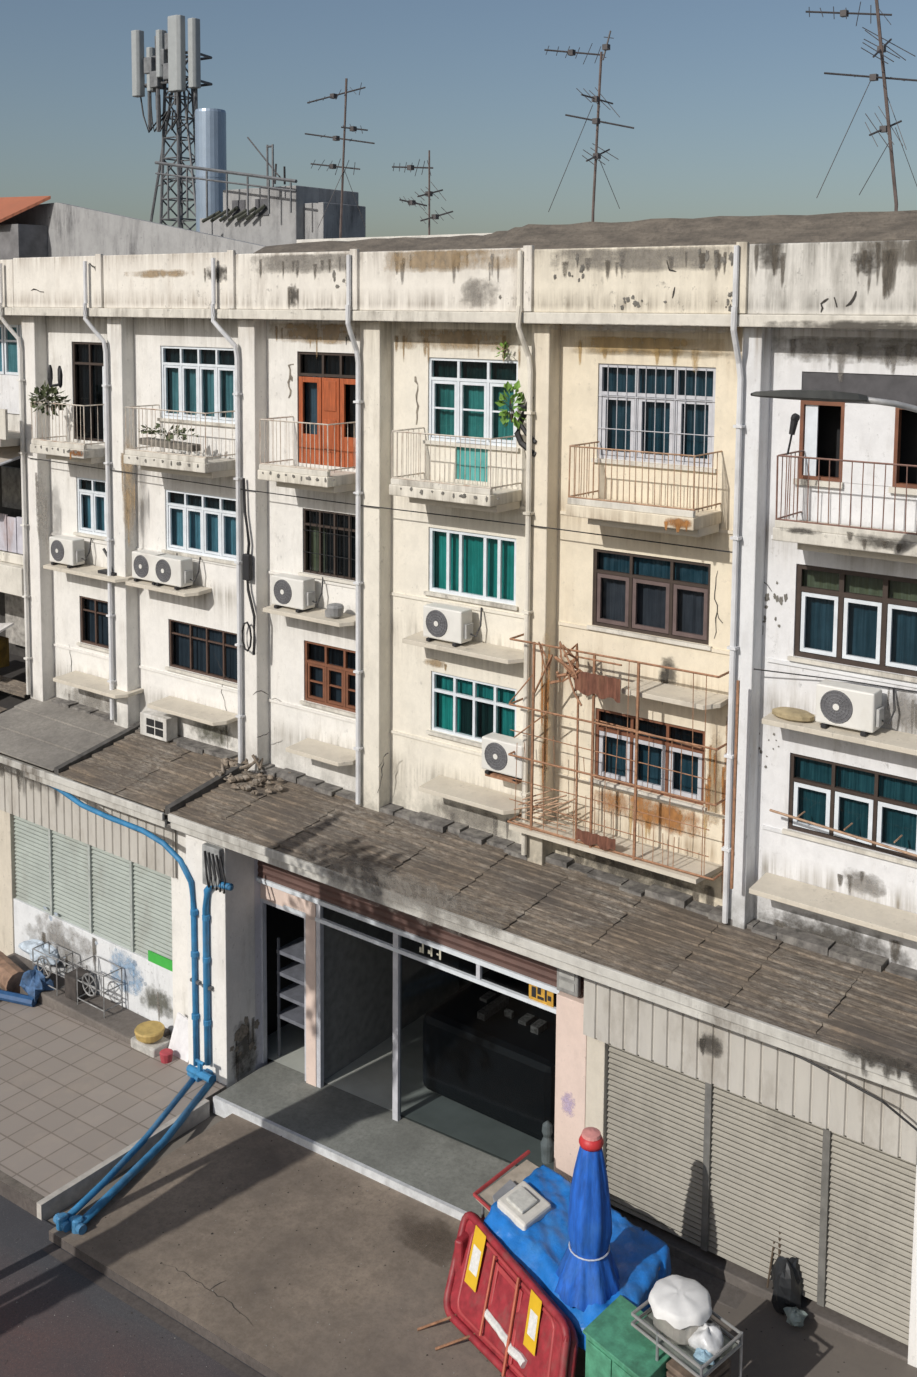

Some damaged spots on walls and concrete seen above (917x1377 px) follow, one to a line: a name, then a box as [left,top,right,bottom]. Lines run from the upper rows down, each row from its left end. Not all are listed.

leakage [563,249,727,276]
leakage [754,242,785,284]
leakage [855,239,917,295]
leakage [260,254,356,355]
corrosion [664,519,690,532]
leakage [660,660,675,684]
leakage [887,691,917,729]
corrosion [576,719,728,889]
leakage [838,872,882,895]
leakage [234,1018,256,1076]
leakage [698,1035,722,1057]